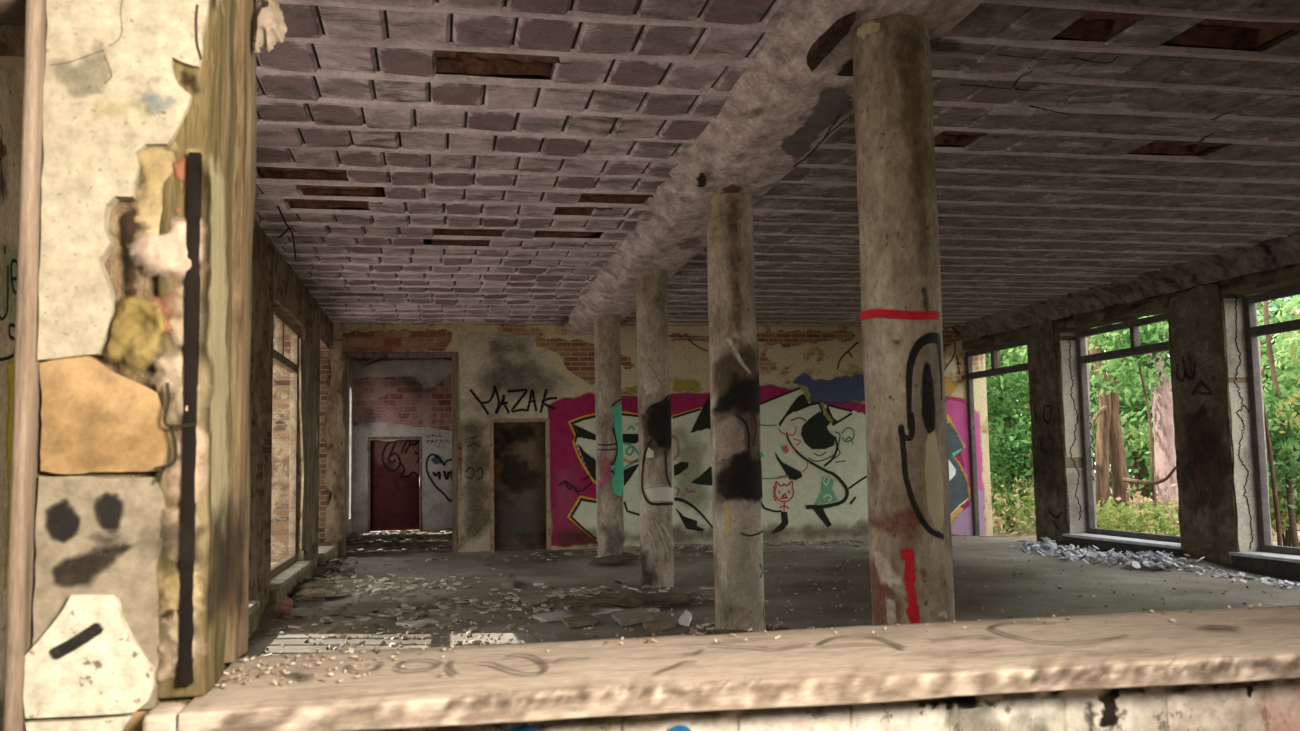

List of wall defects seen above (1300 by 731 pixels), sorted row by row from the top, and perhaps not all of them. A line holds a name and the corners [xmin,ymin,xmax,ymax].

spalling [1081,11,1148,21]
peeling [23,142,229,731]
flaking render [299,329,595,553]